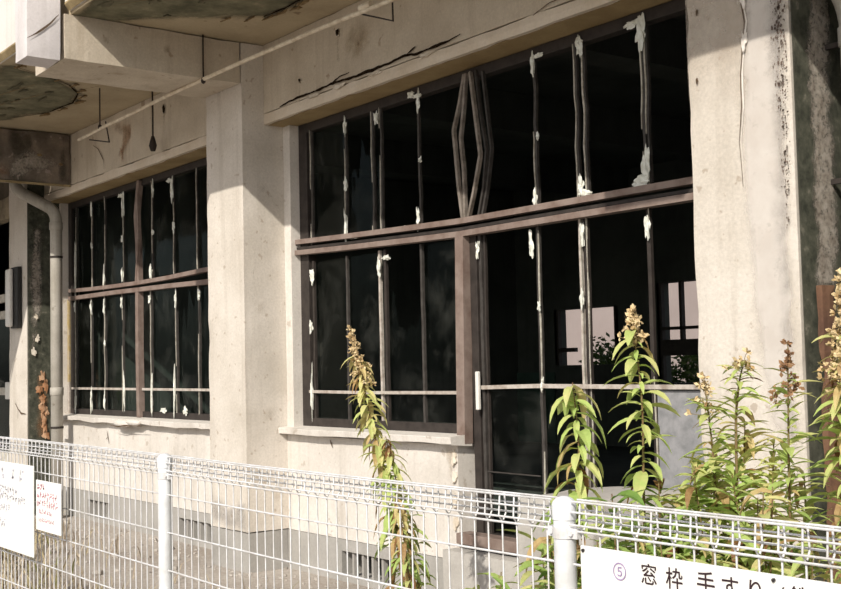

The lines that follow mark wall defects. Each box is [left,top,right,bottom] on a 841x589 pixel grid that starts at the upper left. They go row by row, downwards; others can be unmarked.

flaking render [77,0,310,22]
flaking render [0,64,87,120]
crack [280,34,460,107]
leakage [770,0,790,228]